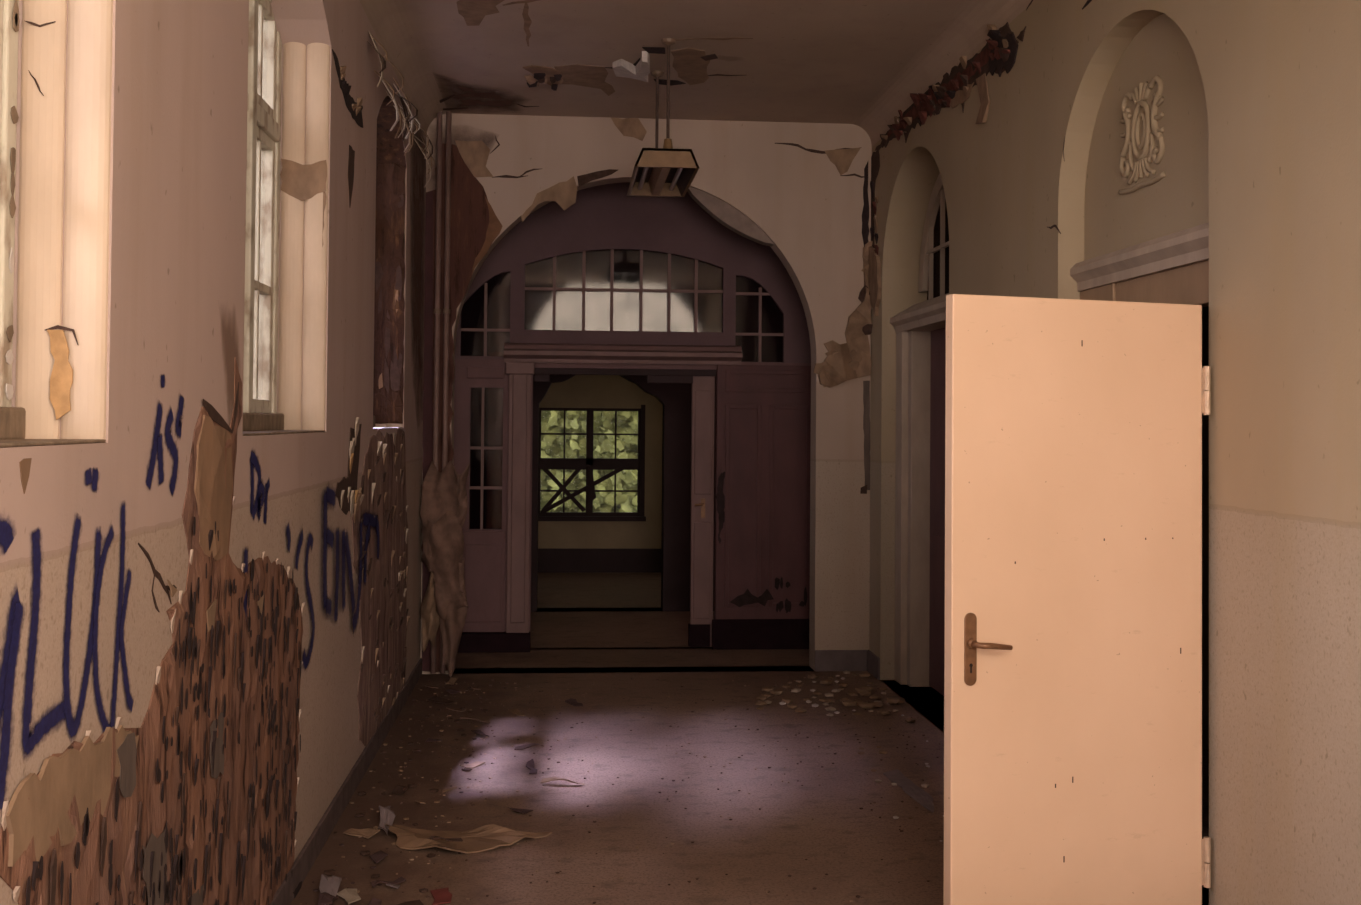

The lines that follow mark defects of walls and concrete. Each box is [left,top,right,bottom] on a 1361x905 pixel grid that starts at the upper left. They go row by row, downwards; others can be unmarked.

peeling [457,0,504,26]
spalling [523,65,562,91]
peeling [633,47,718,86]
crack [775,143,864,178]
flaking render [521,169,618,222]
peeling [813,30,1010,388]
peeling [47,330,73,420]
peeling [0,358,305,905]